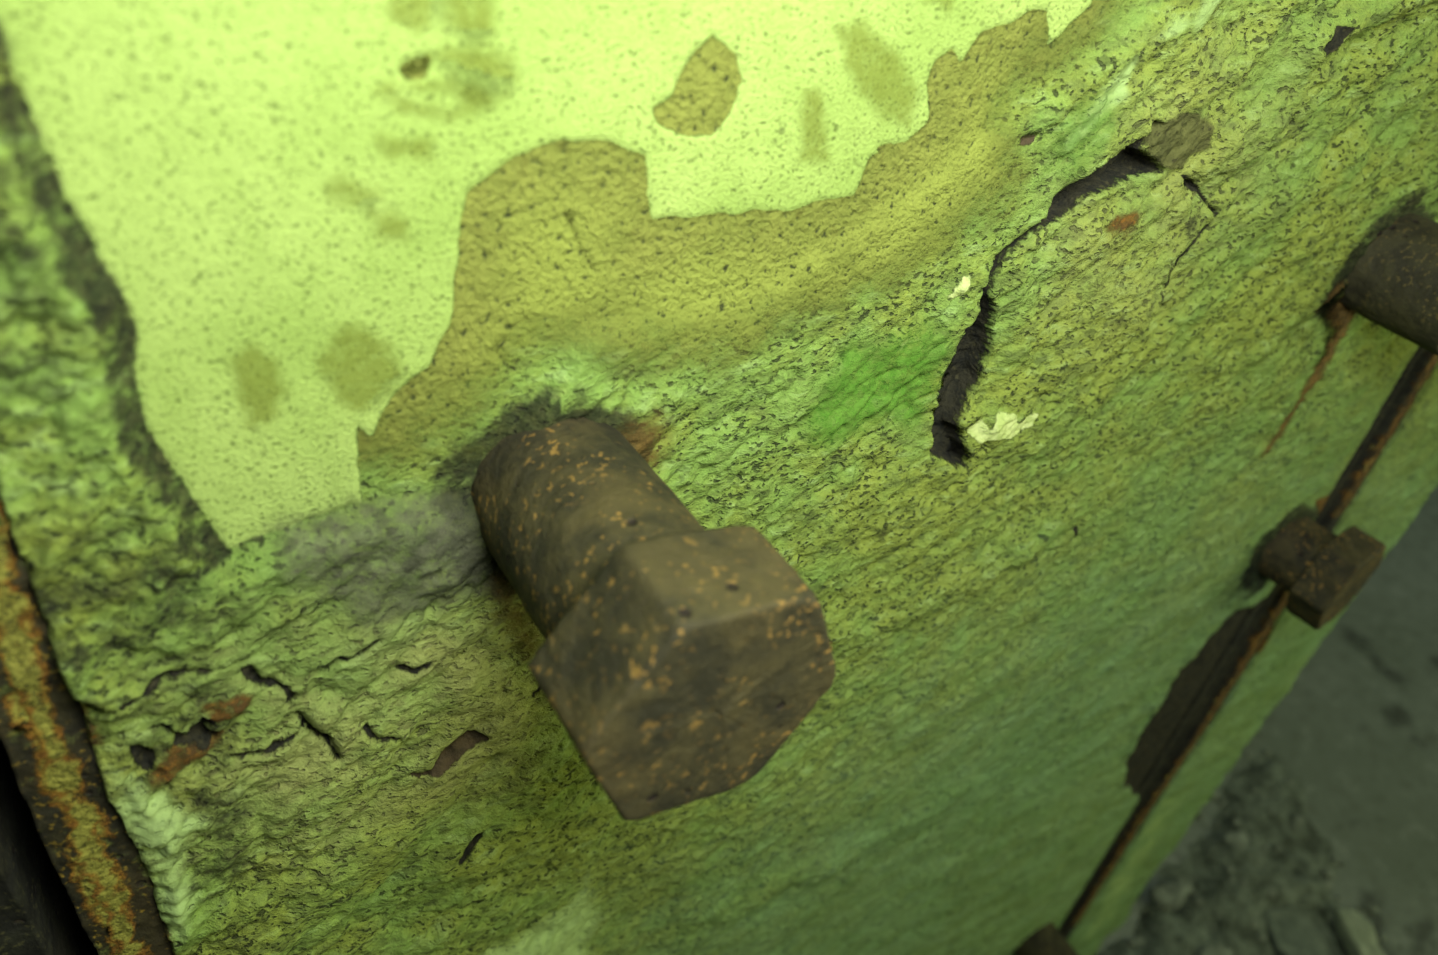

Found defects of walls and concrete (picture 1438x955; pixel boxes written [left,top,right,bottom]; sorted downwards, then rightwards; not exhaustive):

peeling [357,0,1110,462]
crack [930,112,1218,468]
rust [1263,283,1356,455]
rust [151,695,252,784]
crack [89,665,400,759]
crack [323,639,431,674]